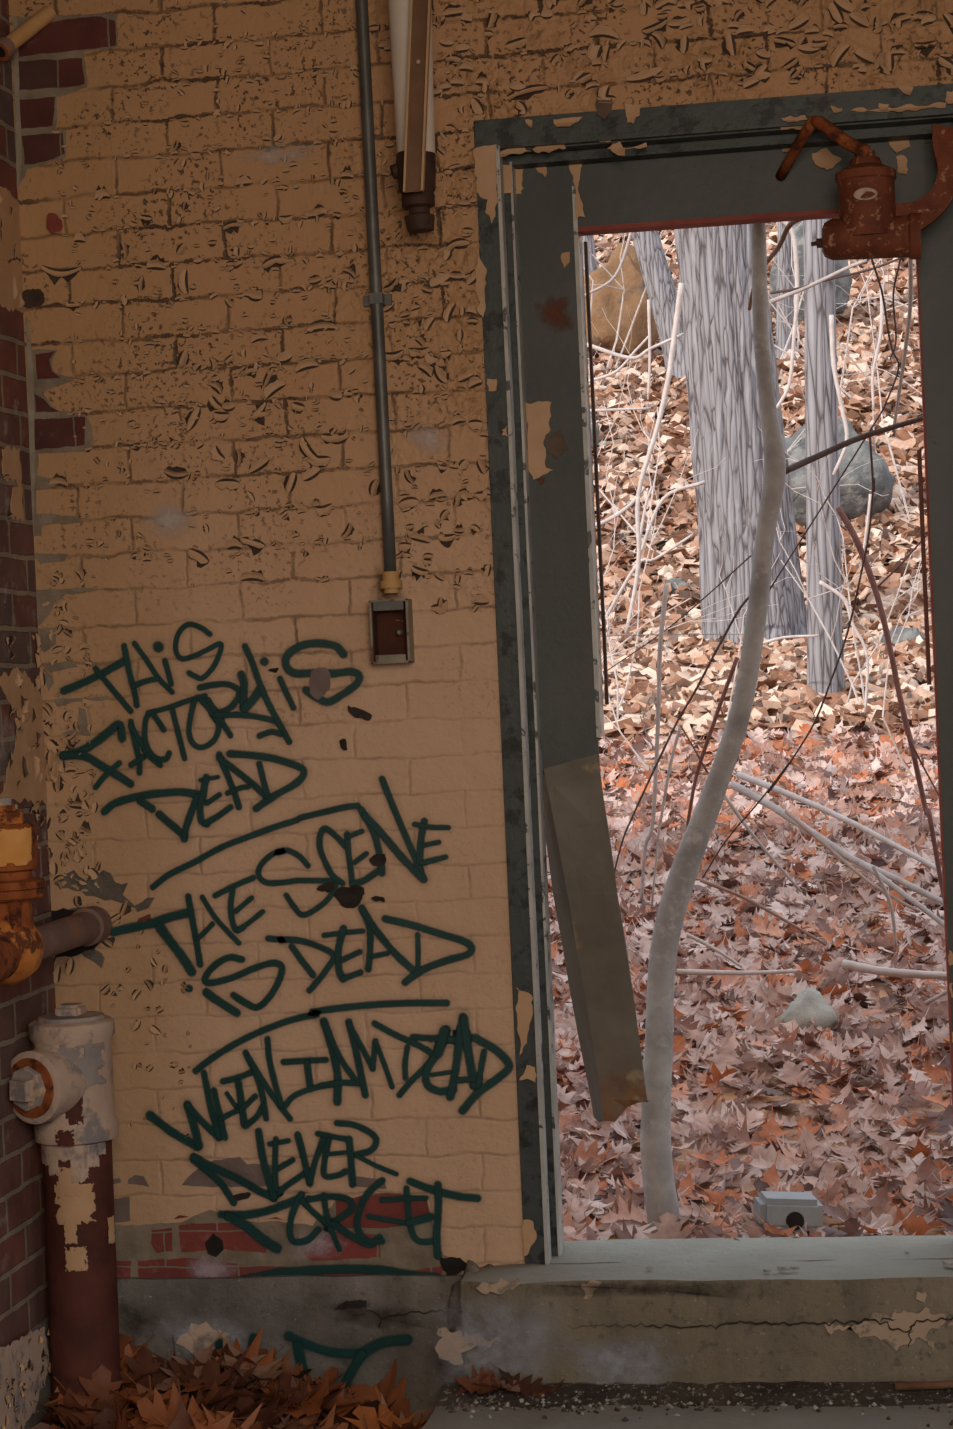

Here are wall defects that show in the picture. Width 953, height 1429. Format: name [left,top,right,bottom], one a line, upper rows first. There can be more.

peeling [0,0,953,614]
peeling [348,705,372,721]
peeling [0,553,187,1045]
peeling [317,880,385,908]
peeling [516,988,537,1082]
peeling [182,1157,272,1201]
peeling [113,1175,462,1278]
peeling [521,1219,537,1257]
peeling [435,1326,502,1365]
crack [568,1317,953,1347]
peeling [825,1291,953,1351]
peeling [0,1327,51,1429]